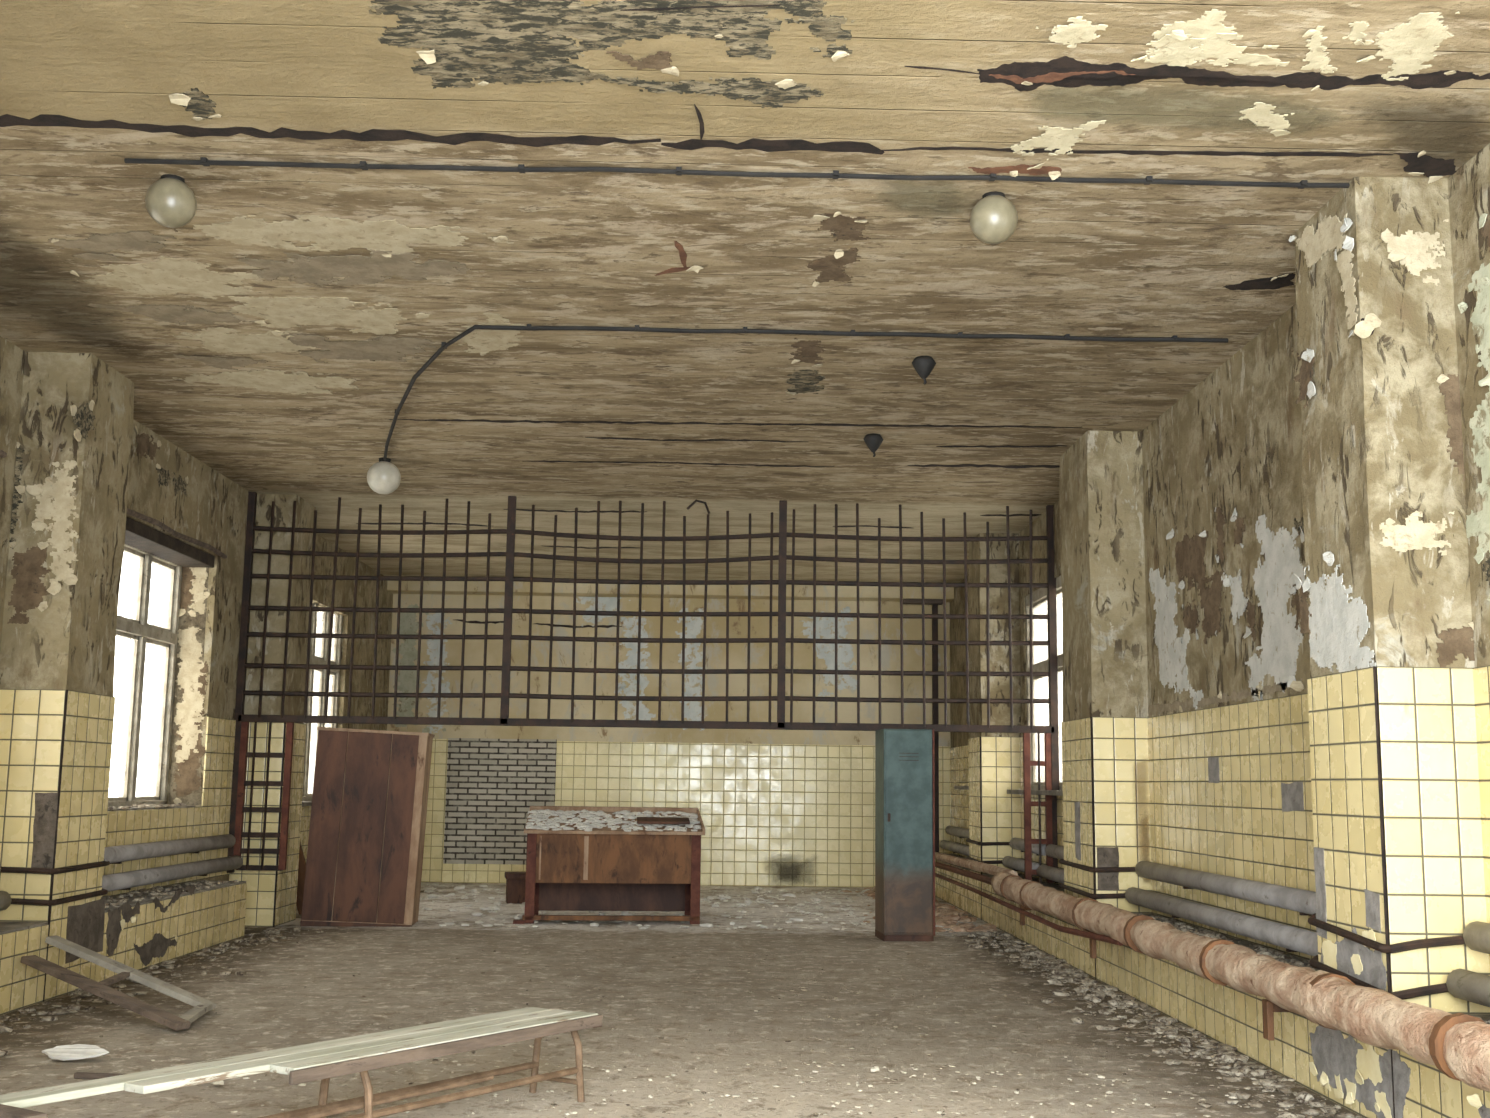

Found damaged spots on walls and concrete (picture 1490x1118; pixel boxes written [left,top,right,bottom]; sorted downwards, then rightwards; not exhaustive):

spalling [369,0,855,140]
peeling [1010,120,1106,161]
peeling [1036,16,1108,48]
peeling [1239,102,1295,137]
peeling [1131,9,1460,81]
peeling [1289,214,1382,338]
peeling [1379,213,1490,601]
peeling [7,442,79,624]
peeling [1147,507,1376,717]
peeling [168,567,210,806]
spalling [1313,847,1387,991]
spalling [1309,1025,1411,1118]